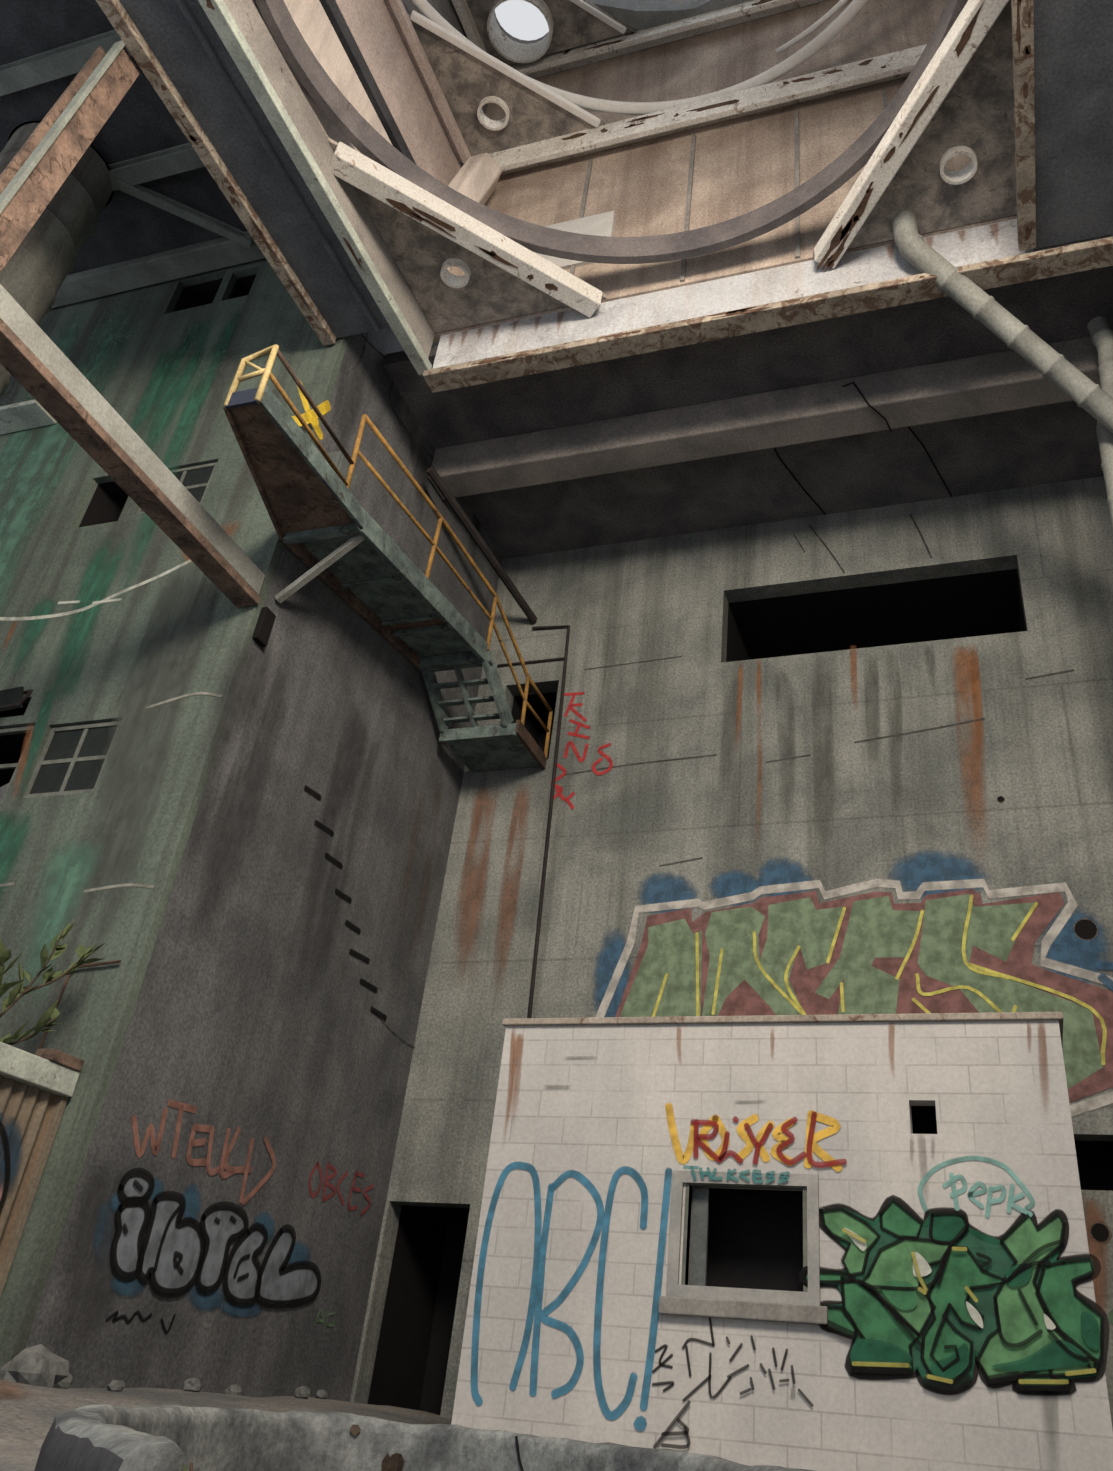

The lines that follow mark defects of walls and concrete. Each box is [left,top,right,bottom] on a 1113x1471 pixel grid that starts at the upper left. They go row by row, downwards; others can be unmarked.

damp [57,329,74,357]
damp [81,327,117,392]
damp [132,319,237,467]
damp [0,422,77,602]
damp [17,602,52,663]
damp [26,550,120,773]
damp [31,590,212,970]
corrosion [957,650,982,794]
damp [0,817,26,889]
corrosion [463,796,489,944]
corrosion [1085,1204,1104,1307]